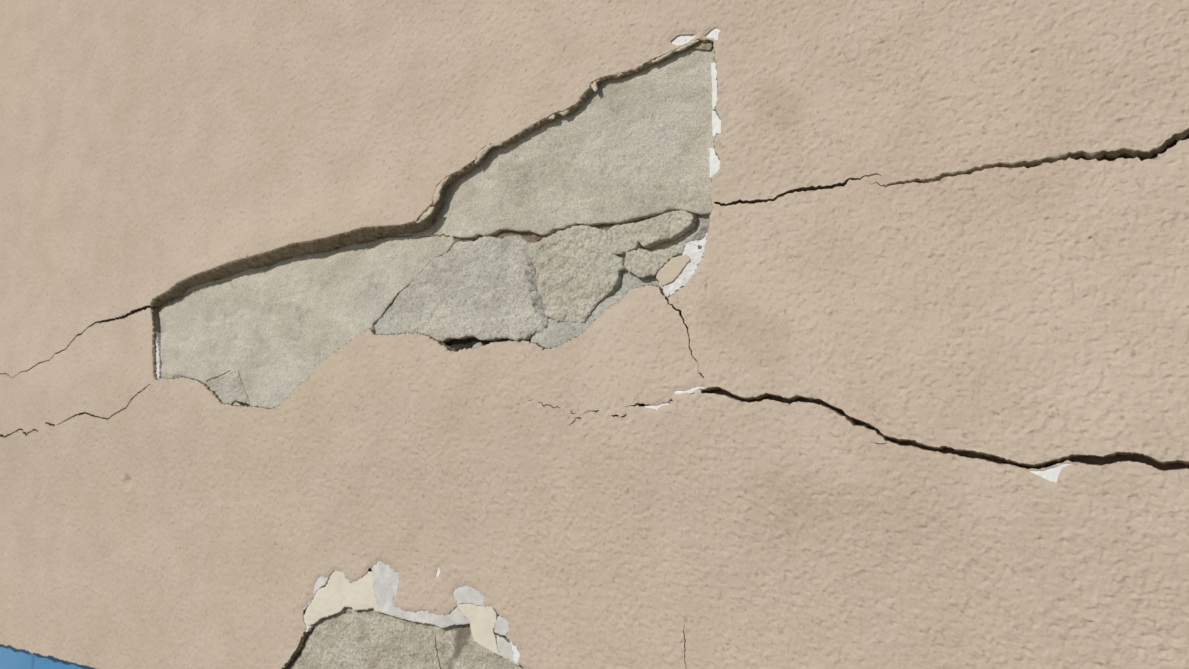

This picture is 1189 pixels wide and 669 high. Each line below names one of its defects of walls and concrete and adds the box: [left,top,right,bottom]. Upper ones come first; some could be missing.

spalling [149,27,722,411]
crack [372,128,1189,325]
crack [0,384,151,438]
crack [0,305,156,378]
crack [528,289,1189,472]
spalling [281,560,525,669]